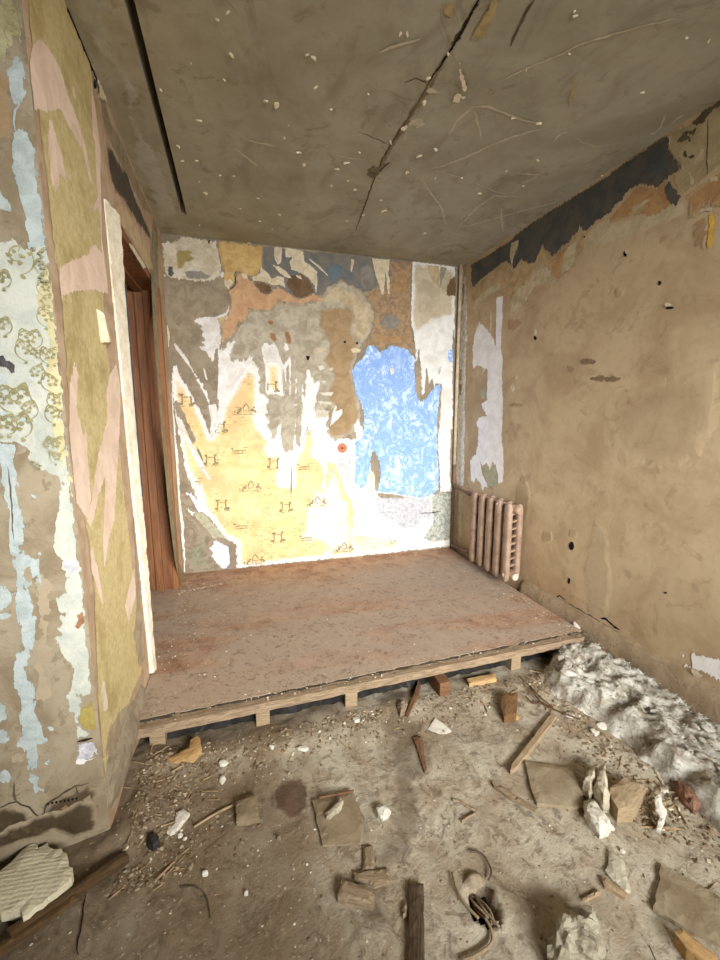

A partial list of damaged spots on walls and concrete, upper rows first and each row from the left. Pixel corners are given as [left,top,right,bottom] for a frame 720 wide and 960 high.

crack [356,0,480,229]
crack [510,0,535,46]
peeling [69,0,222,584]
peeling [255,246,412,299]
peeling [456,113,681,542]